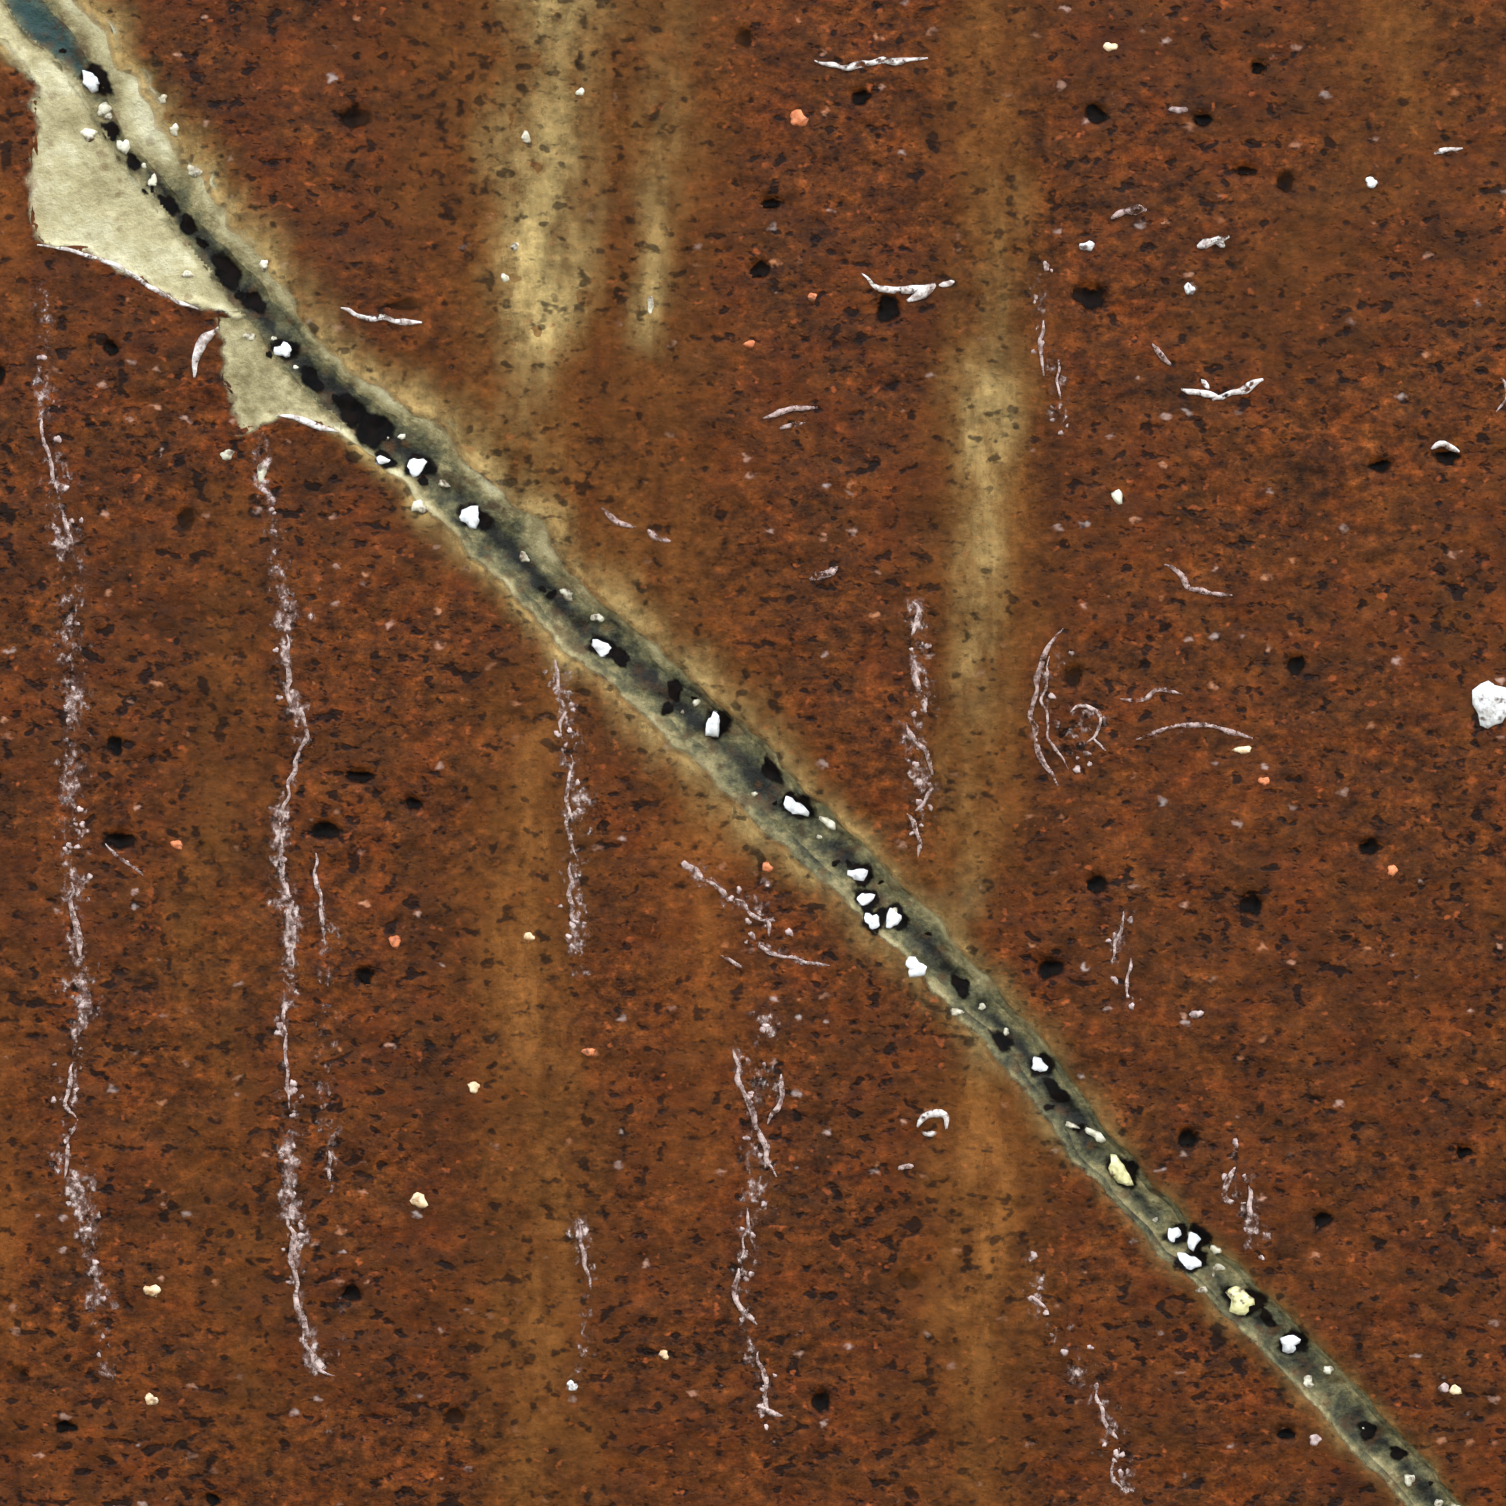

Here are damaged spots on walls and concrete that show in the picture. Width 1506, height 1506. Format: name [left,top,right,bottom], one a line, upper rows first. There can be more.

spalling [342,105,370,129]
peeling [0,0,345,433]
peeling [220,449,234,460]
water stain [271,527,297,665]
crack [0,0,1208,1273]
water stain [268,804,303,973]
water stain [62,933,94,1040]
rust [474,681,592,1506]
water stain [51,1153,118,1309]
water stain [278,1136,308,1284]
rust [927,1068,1036,1502]
crack [1182,1223,1463,1506]